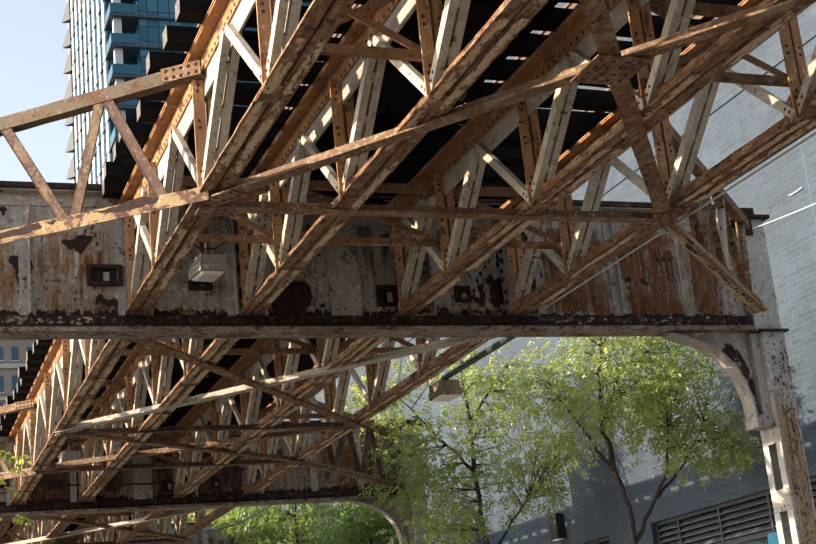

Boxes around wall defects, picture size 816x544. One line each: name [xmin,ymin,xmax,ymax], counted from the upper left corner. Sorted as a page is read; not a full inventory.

peeling [722,11,794,67]
peeling [642,75,701,122]
peeling [538,147,623,203]
peeling [3,255,19,293]
peeling [0,219,56,239]
rust [35,232,111,315]
peeling [31,225,119,325]
peeling [91,196,158,213]
peeling [417,212,539,316]
rust [543,228,563,281]
rust [619,232,723,315]
rust [775,392,816,544]